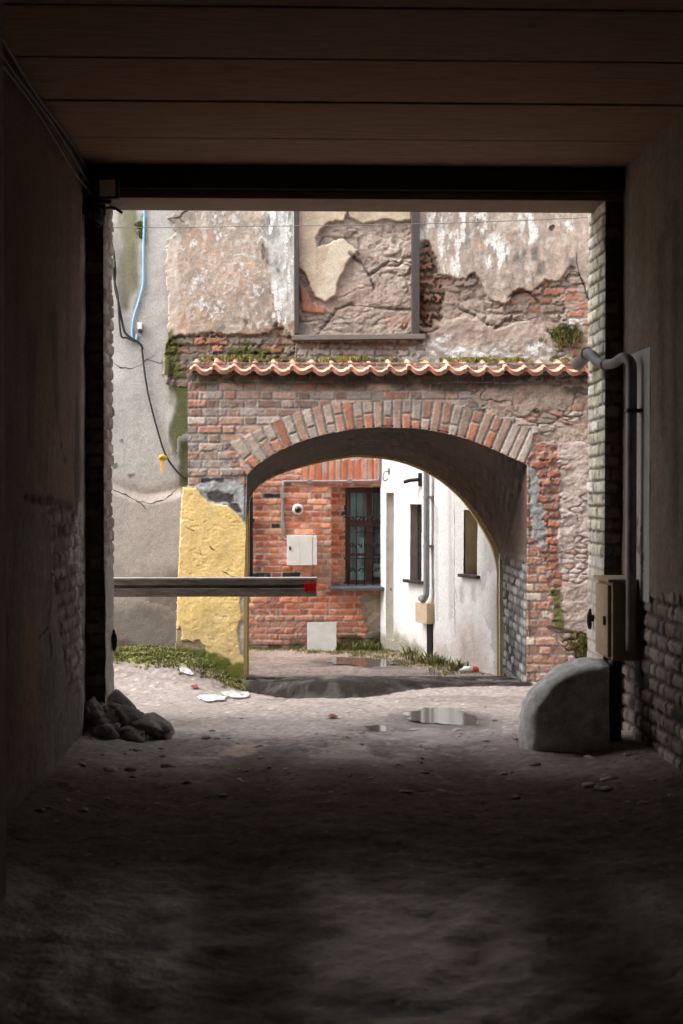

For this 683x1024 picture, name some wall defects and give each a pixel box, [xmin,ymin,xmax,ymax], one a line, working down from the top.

flaking render [165,211,590,386]
water stain [169,385,234,487]
crack [113,489,177,508]